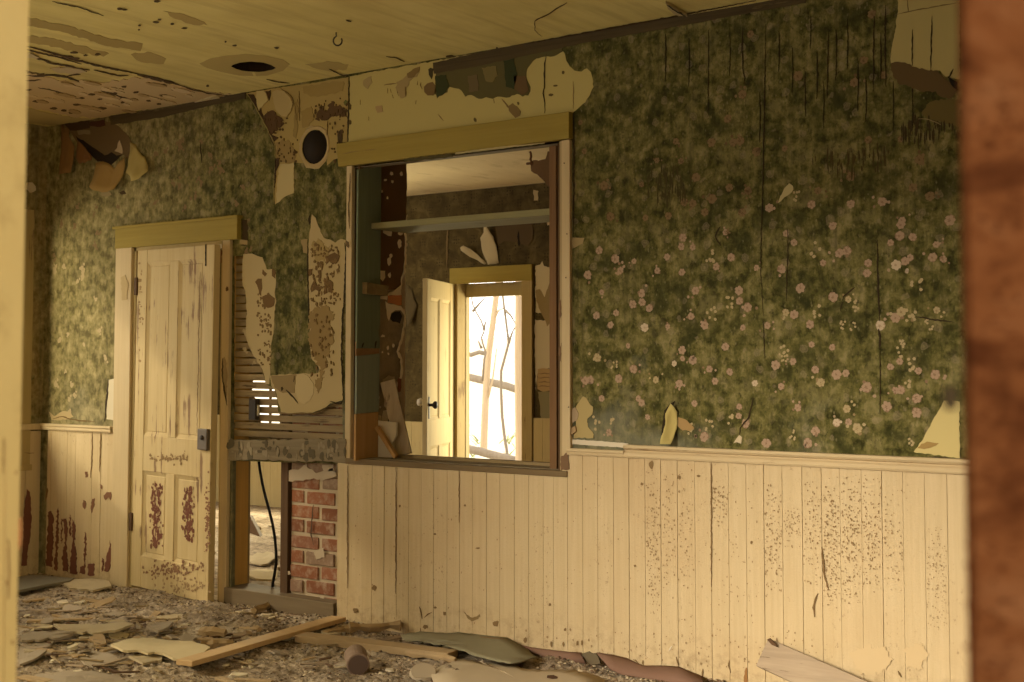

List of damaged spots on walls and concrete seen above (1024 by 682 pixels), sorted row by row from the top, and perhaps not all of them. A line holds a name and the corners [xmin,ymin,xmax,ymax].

damp [28,0,207,64]
flaking render [890,0,959,90]
damp [27,84,173,114]
flaking render [246,52,594,204]
damp [892,84,954,150]
peeling [240,215,349,413]
peeling [18,490,32,566]
peeling [45,509,111,576]
spalling [82,484,112,513]
peeling [142,471,211,597]